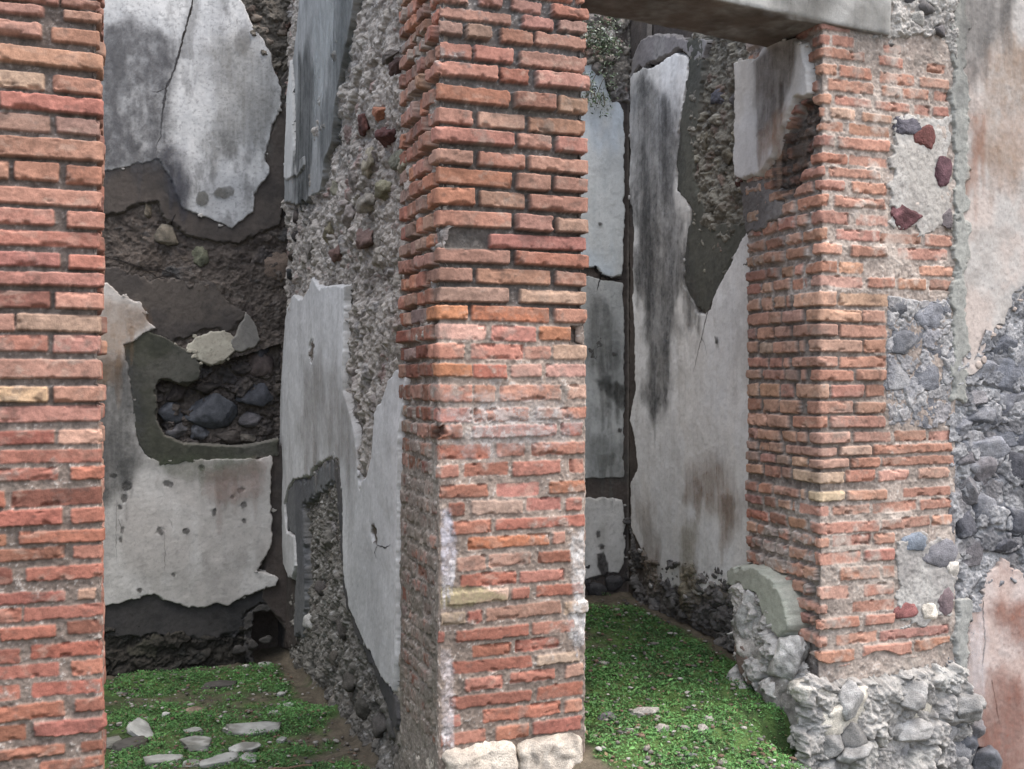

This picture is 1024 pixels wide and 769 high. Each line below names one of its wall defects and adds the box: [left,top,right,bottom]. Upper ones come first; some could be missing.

crack [153,0,193,146]
flaking render [652,24,693,55]
spalling [196,187,234,218]
spalling [286,210,299,280]
water stain [629,76,687,418]
spalling [104,266,282,445]
spalling [233,596,273,663]